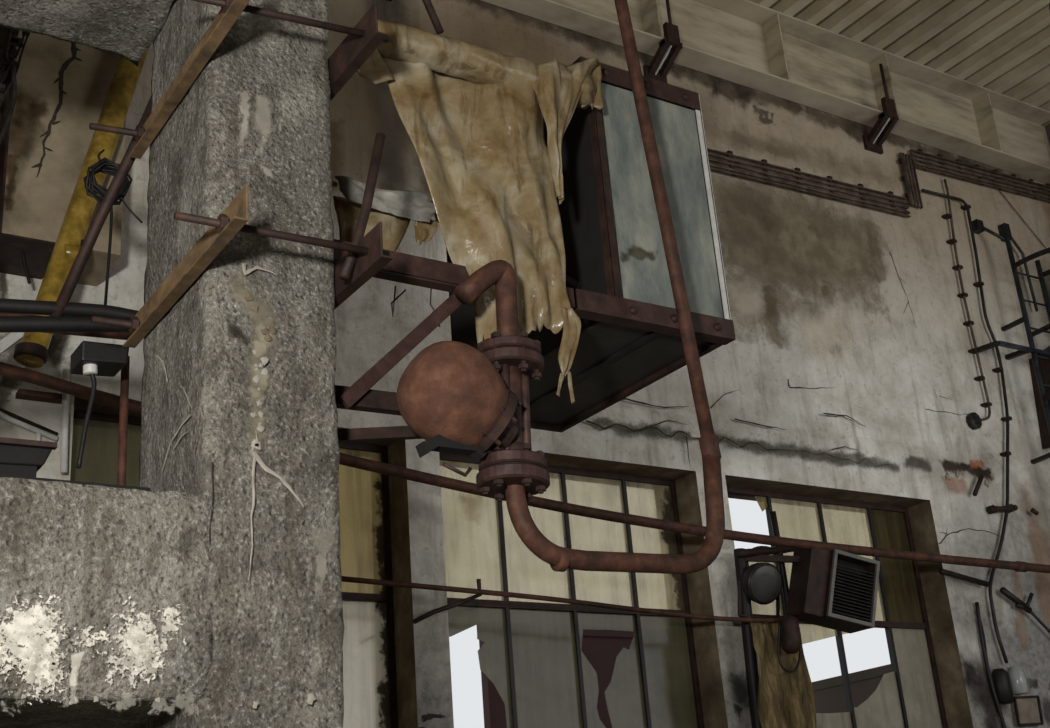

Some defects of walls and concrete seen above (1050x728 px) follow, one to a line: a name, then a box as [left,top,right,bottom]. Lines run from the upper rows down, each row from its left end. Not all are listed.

crack [31,42,82,177]
damp [716,183,884,354]
crack [586,415,932,472]
peeling [0,591,190,704]